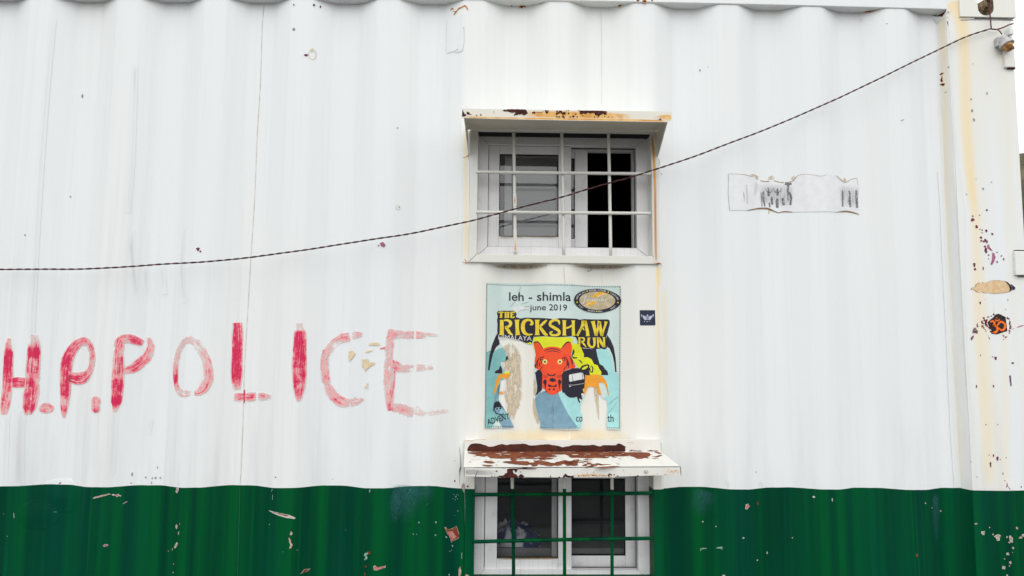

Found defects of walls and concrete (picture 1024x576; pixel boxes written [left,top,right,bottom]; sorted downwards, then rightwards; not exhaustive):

rust [461,109,672,440]
rust [931,0,1015,490]
peeling [971,209,1015,304]
peeling [349,342,380,389]
peeling [974,523,1024,576]